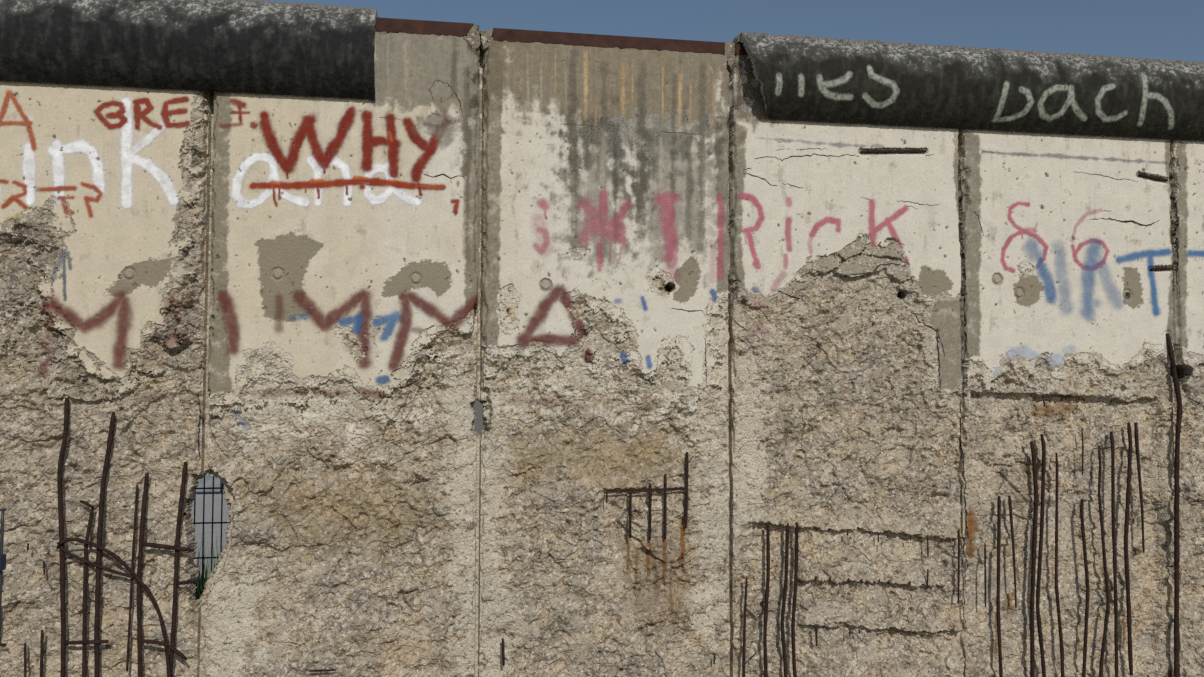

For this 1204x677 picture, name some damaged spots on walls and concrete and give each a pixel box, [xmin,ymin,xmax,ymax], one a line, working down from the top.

damp [371,31,773,258]
corrosion [24,629,44,677]
corrosion [56,399,195,677]
spalling [0,90,486,677]
corrosion [606,452,689,573]
corrosion [742,522,799,677]
spalling [477,129,1181,677]
corrosion [957,434,1065,677]
corrosion [1079,422,1149,677]
corrosion [1166,333,1183,677]
spalling [1172,342,1204,677]